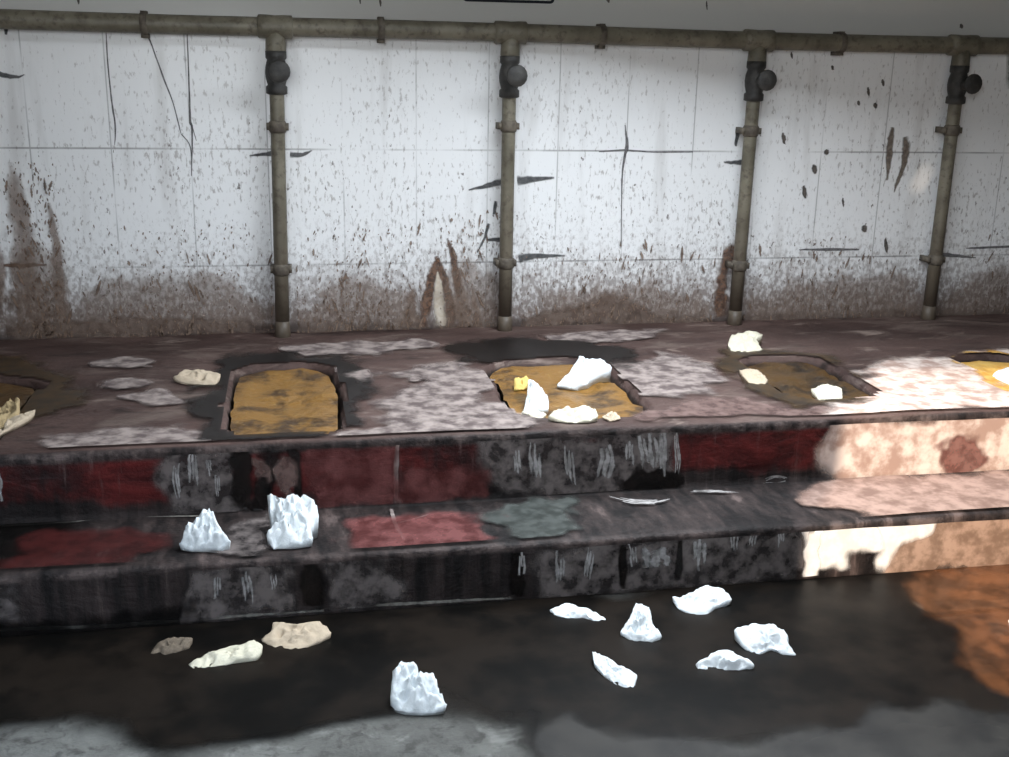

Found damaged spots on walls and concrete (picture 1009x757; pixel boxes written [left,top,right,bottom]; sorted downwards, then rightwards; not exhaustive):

rust [0,179,68,325]
damp [3,162,275,339]
damp [296,210,500,333]
rust [404,238,480,328]
damp [442,239,716,368]
damp [745,236,893,320]
damp [977,369,1009,391]
peeling [252,362,675,548]
damp [0,520,86,565]
peeling [326,560,404,609]
damp [480,497,579,538]
damp [0,539,1009,757]